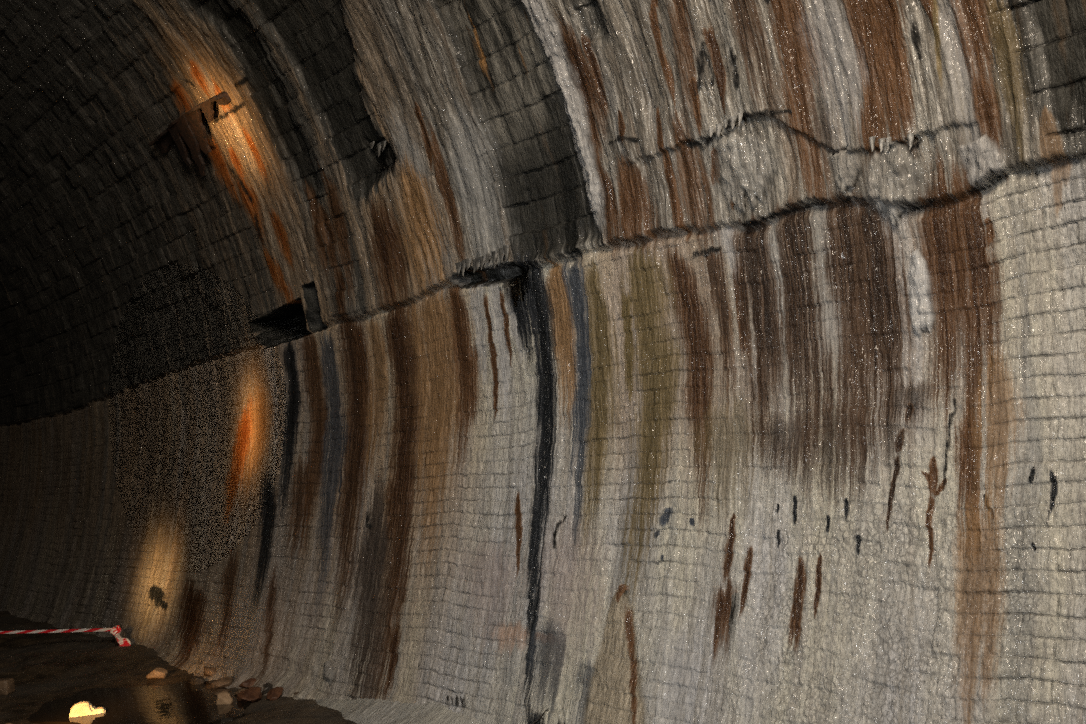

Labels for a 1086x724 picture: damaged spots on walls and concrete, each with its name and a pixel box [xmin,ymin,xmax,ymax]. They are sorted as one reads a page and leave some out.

corrosion [207,137,302,304]
spalling [188,0,325,200]
crack [609,136,638,144]
crack [686,42,792,150]
crack [743,196,935,226]
corrosion [951,0,1022,159]
crack [970,174,1007,194]
spalling [250,281,328,349]
corrosion [306,103,512,699]
water stain [562,260,592,539]
corrosion [546,0,1010,724]
water stain [501,252,557,724]